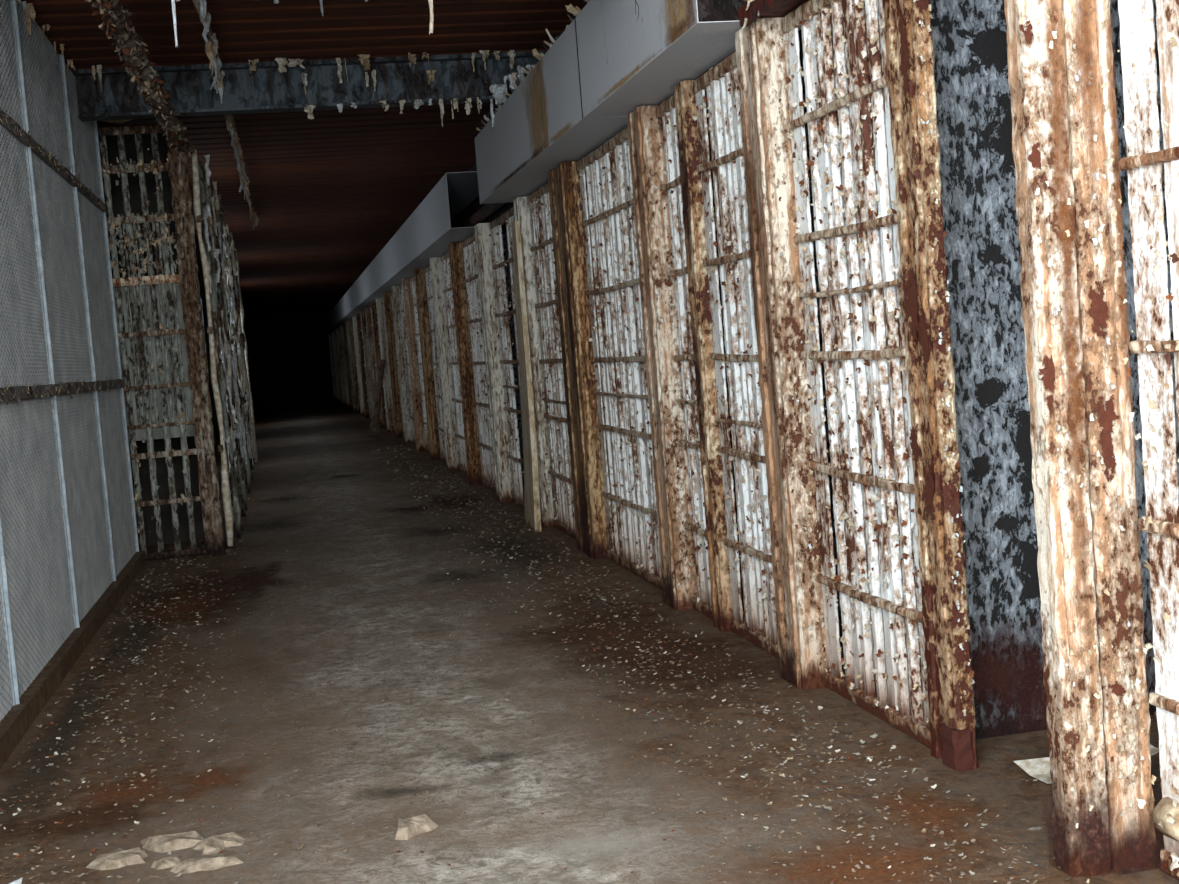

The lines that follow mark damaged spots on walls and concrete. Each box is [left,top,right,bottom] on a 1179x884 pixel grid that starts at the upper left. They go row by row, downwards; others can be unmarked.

peeling [275,57,315,119]
corrosion [1078,0,1093,104]
peeling [0,0,259,472]
corrosion [677,141,691,273]
corrosion [747,153,776,410]
corrosion [1049,28,1081,474]
corrosion [1108,19,1130,404]
corrosion [558,253,591,553]
corrosion [693,327,703,440]
corrosion [662,575,673,608]
corrosion [972,633,1047,733]
corrosion [1047,792,1160,874]